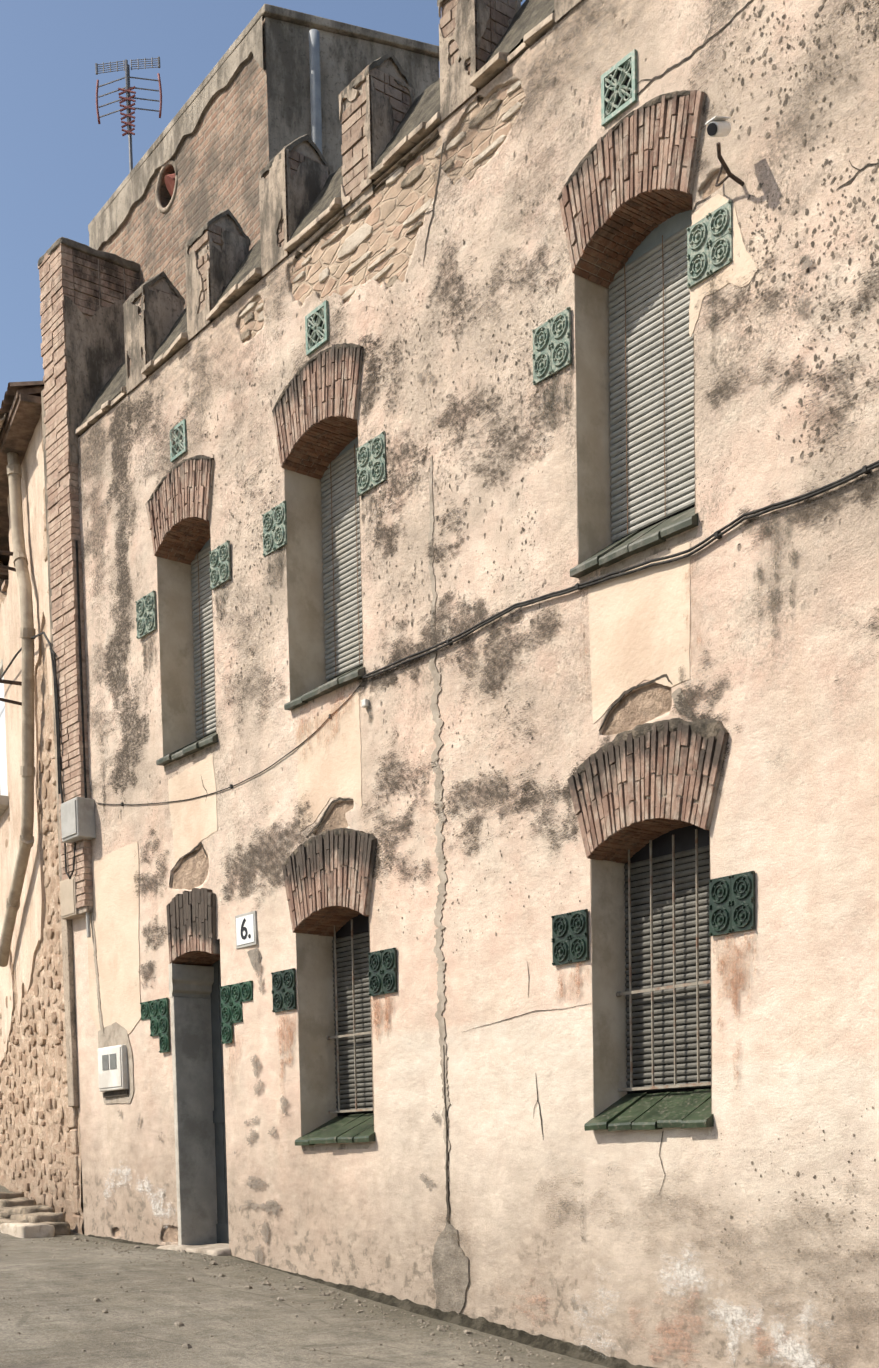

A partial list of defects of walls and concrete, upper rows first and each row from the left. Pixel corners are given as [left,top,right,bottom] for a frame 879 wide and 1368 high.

crack [637,0,753,95]
flaking render [288,80,526,305]
crack [836,160,879,191]
flaking render [602,683,672,735]
flaking render [171,846,209,890]
crack [428,456,591,1314]
leakage [712,1208,879,1368]